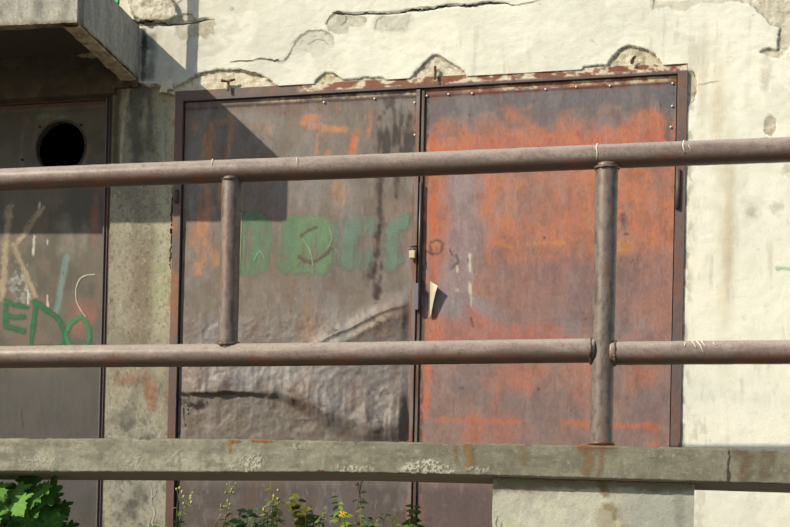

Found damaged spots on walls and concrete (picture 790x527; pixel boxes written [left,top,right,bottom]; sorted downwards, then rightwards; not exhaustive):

crack [332,0,536,23]
flaking render [731,0,790,59]
spalling [62,25,275,95]
crack [230,53,290,62]
spalling [411,55,465,78]
spalling [584,45,661,68]
water stain [112,29,166,164]
water stain [377,104,415,154]
spalling [764,115,776,136]
corrosion [180,392,208,426]